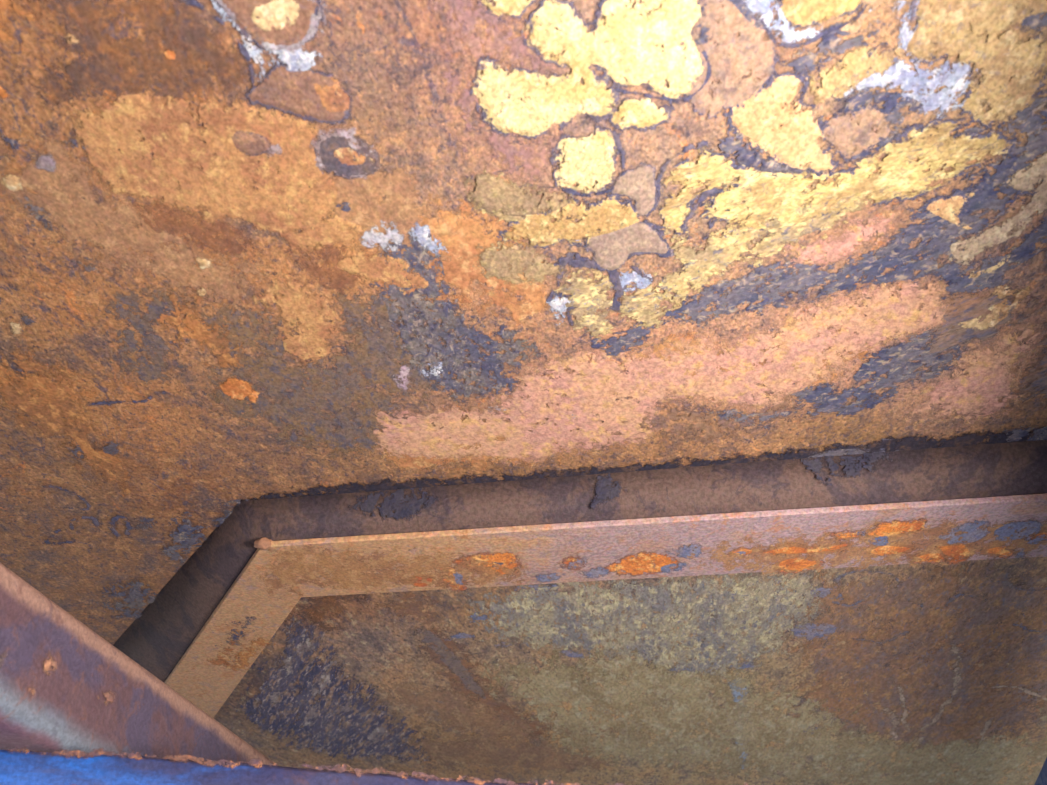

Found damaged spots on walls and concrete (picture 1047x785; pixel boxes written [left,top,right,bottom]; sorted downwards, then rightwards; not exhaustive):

rust [0,0,263,111]
peeling [0,174,23,192]
peeling [36,154,57,172]
rust [285,120,556,327]
peeling [65,0,1047,467]
rust [0,120,270,416]
peeling [10,313,36,334]
rust [0,343,139,497]
rust [259,544,526,601]
rust [602,515,1047,577]
rust [8,747,277,768]
rust [292,763,581,785]